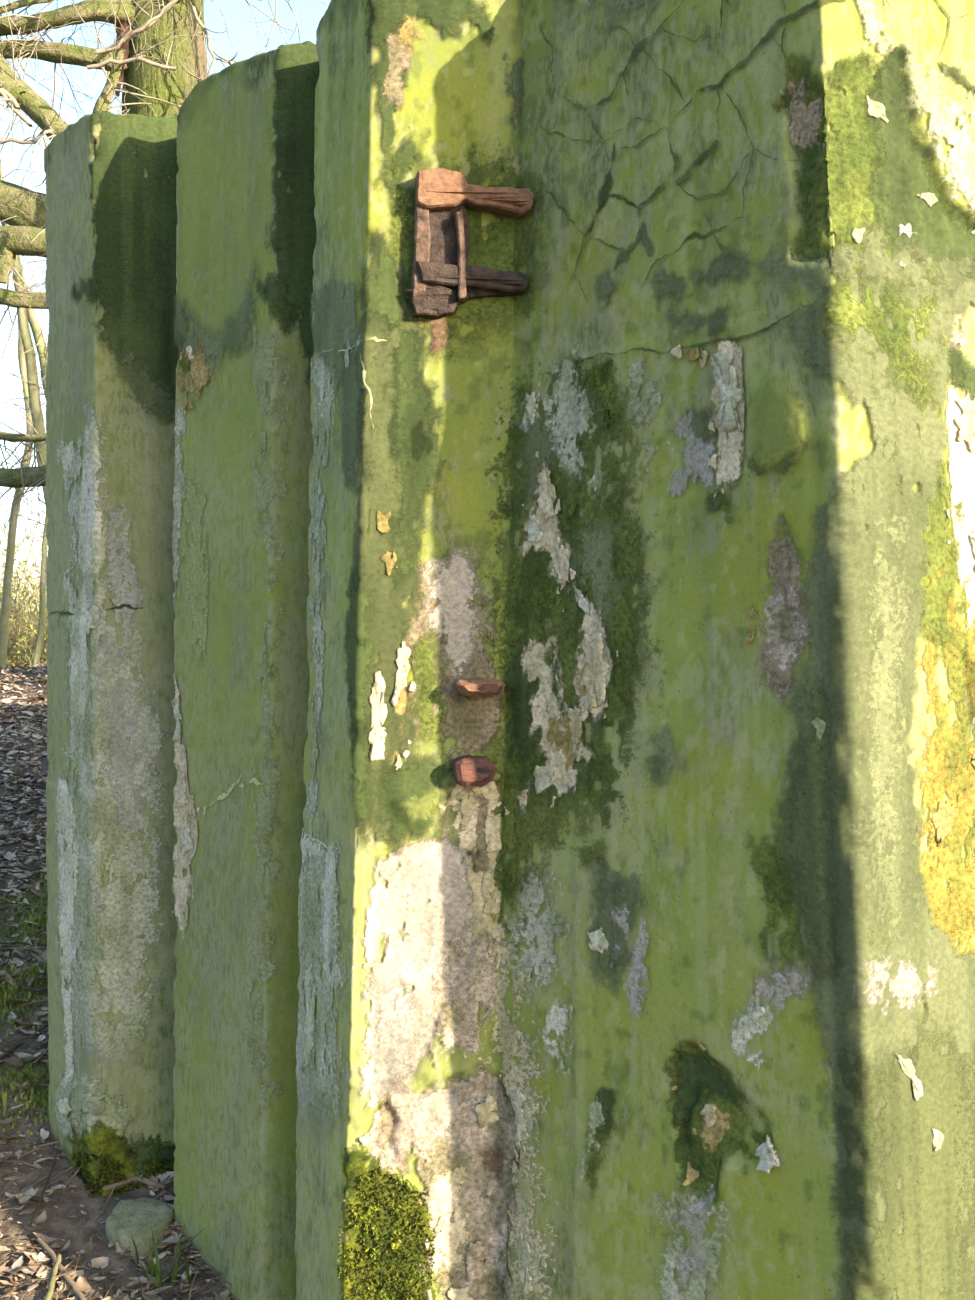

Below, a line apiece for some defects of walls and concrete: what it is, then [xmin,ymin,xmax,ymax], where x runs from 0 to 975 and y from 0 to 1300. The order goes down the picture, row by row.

rust [382,145,547,361]
crack [529,0,844,306]
spalling [771,0,975,295]
crack [936,0,975,99]
peeling [627,340,745,498]
spalling [746,514,813,705]
peeling [946,312,975,627]
peeling [54,402,200,1140]
spalling [296,344,618,1300]
peeling [586,904,650,1017]